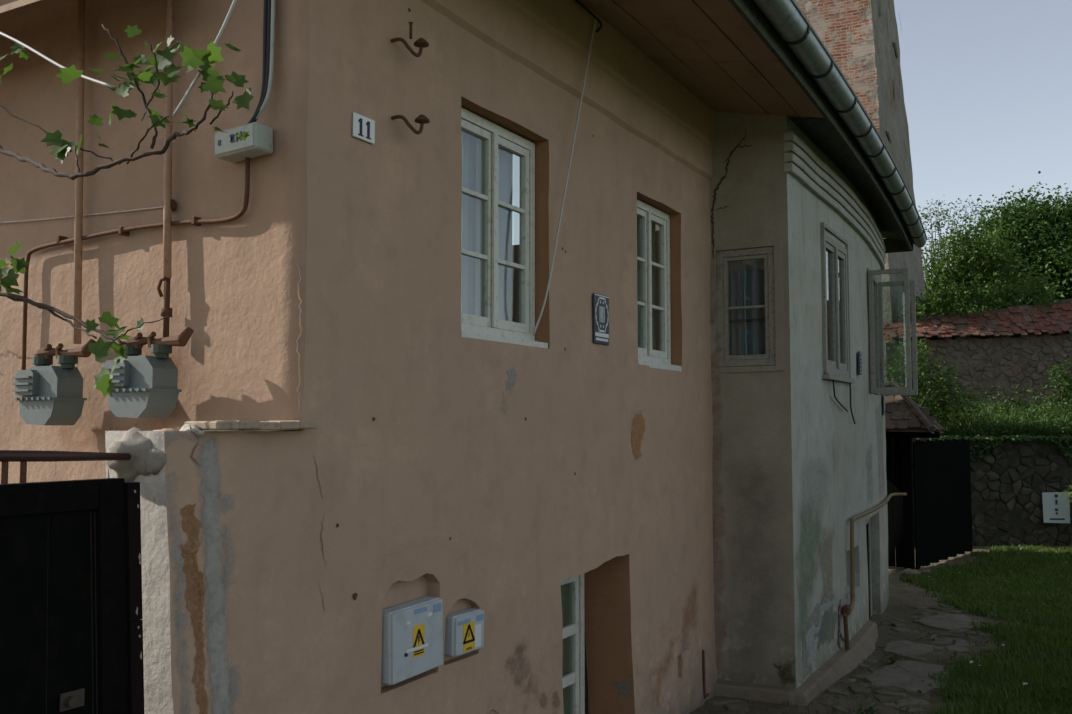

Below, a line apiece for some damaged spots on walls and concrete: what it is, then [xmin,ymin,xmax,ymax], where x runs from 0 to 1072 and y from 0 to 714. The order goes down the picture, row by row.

crack [710,129,752,260]
crack [295,263,303,409]
flaking render [106,424,204,508]
flaking render [180,503,208,714]